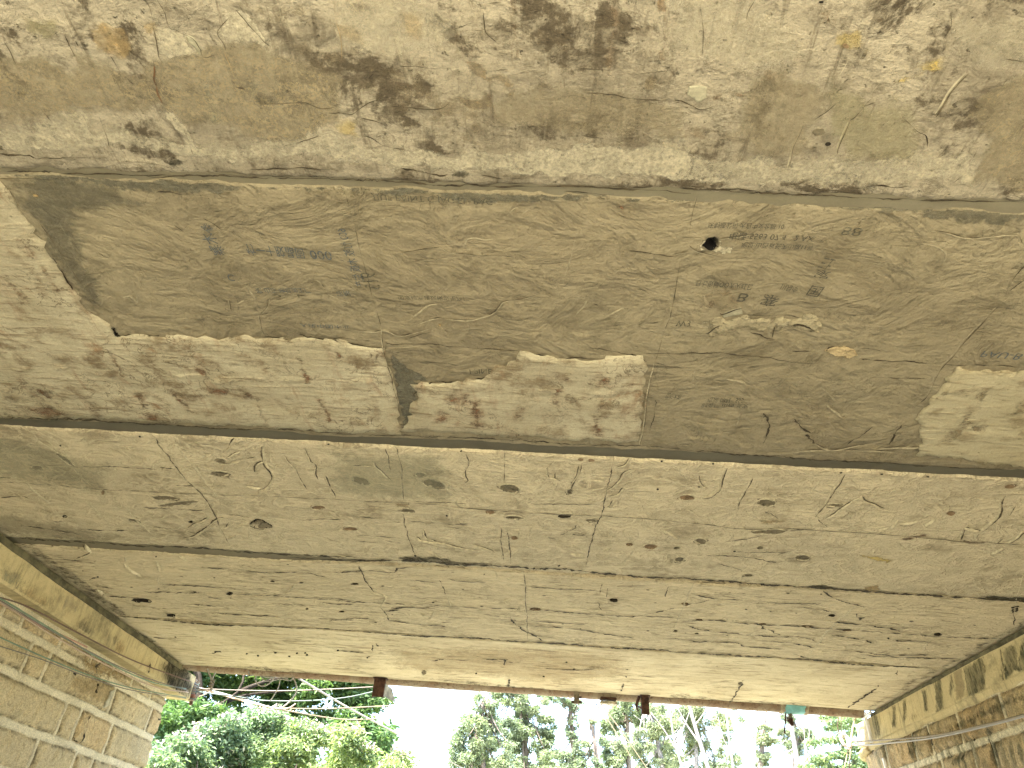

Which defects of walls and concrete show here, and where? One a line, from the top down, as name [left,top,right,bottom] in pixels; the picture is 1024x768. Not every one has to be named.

leakage [0,8,1024,192]
peeling [0,181,648,445]
spalling [708,308,822,337]
spalling [825,346,858,359]
peeling [915,367,1024,467]
crack [0,400,1024,708]